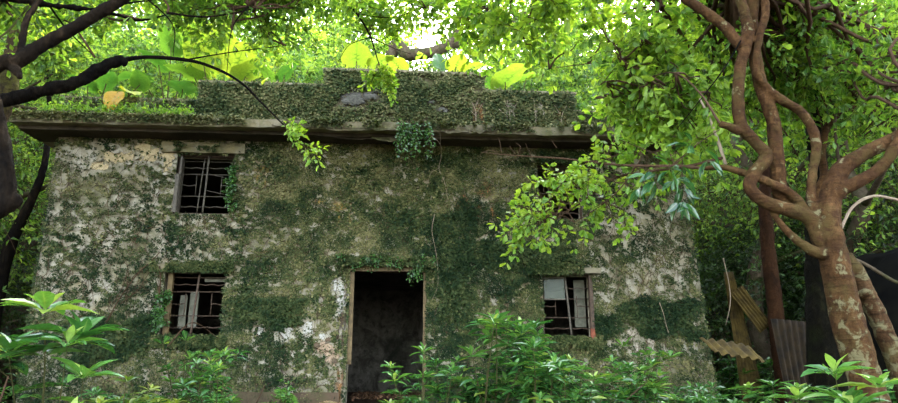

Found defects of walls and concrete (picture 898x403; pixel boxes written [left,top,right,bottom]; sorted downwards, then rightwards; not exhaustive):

peeling [332,280,346,314]
flaking render [275,321,339,366]